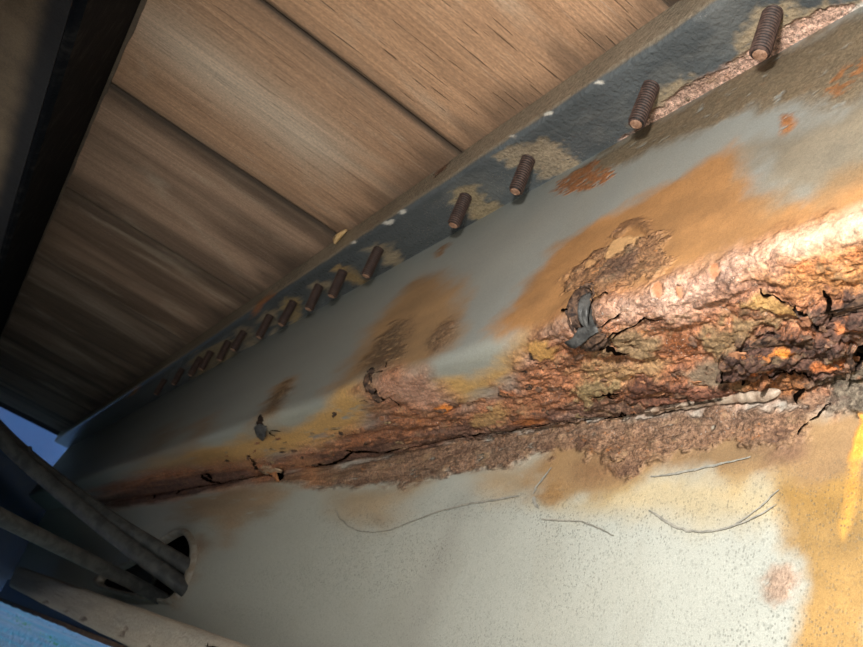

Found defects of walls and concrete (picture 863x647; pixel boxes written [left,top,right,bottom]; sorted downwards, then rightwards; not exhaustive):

peeling [605,235,640,257]
corrosion [83,6,863,552]
peeling [429,329,517,381]
peeling [567,331,665,407]
crack [590,291,662,356]
peeling [680,293,801,387]
crack [759,288,794,307]
crack [768,369,813,403]
crack [822,290,833,321]
peeling [198,390,331,447]
crack [797,403,831,435]
corrosion [752,560,806,613]